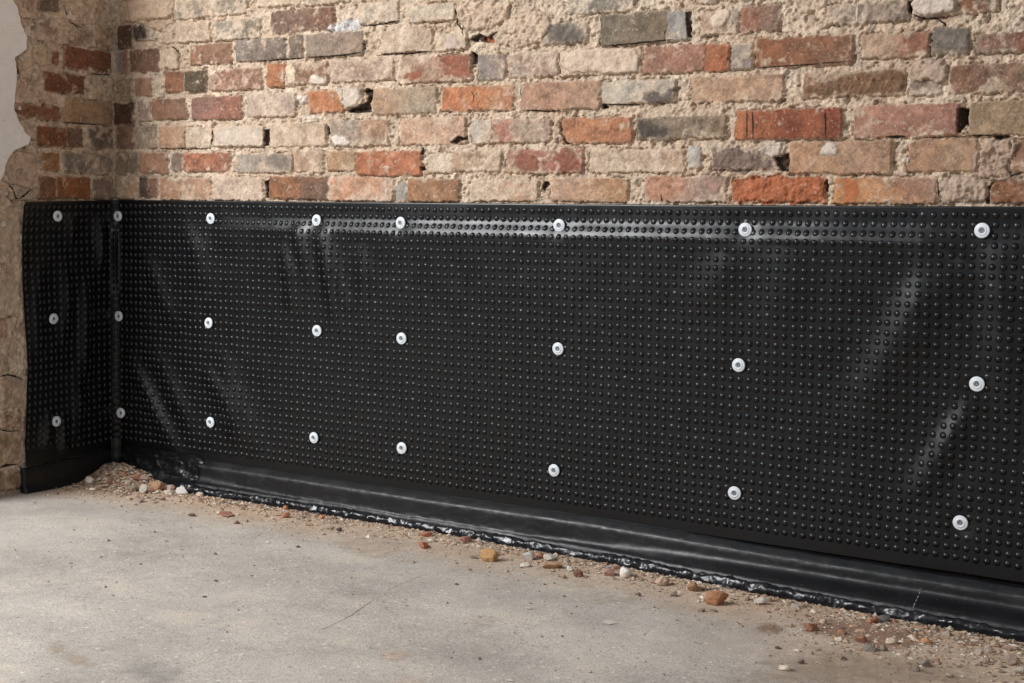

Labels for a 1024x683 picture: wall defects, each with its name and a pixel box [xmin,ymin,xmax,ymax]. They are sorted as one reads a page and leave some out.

peeling [0,0,61,196]